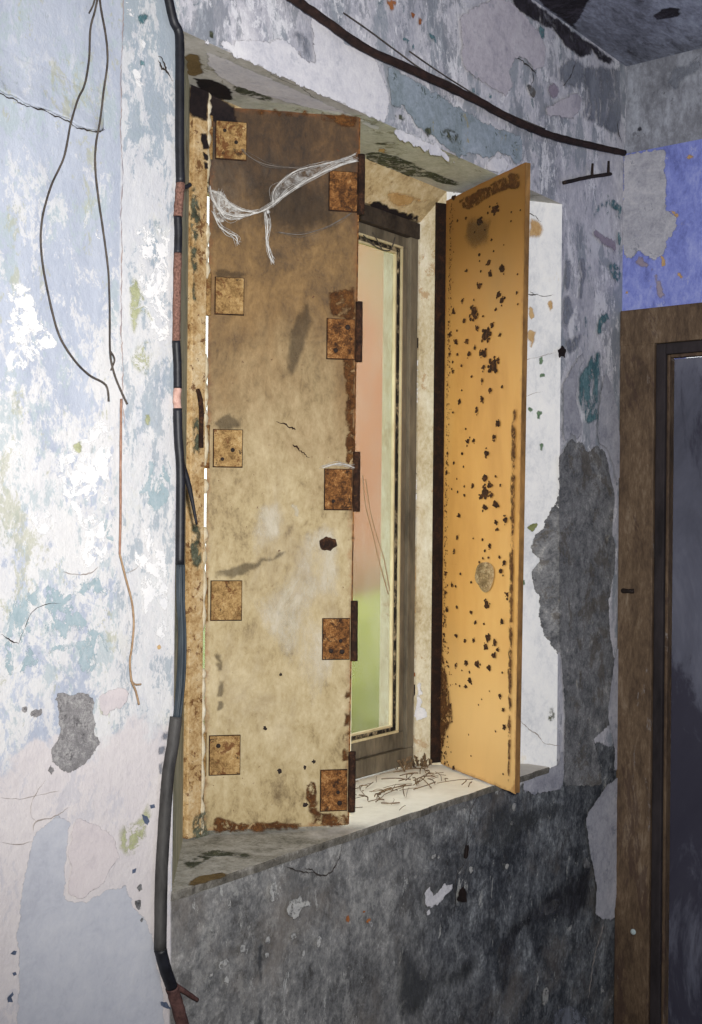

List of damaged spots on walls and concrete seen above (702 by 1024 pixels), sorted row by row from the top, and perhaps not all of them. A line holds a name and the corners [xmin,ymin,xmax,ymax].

water stain [185,54,203,76]
peeling [563,149,678,324]
peeling [585,313,609,334]
spalling [523,336,620,920]
spalling [48,693,100,775]
crack [287,845,342,876]